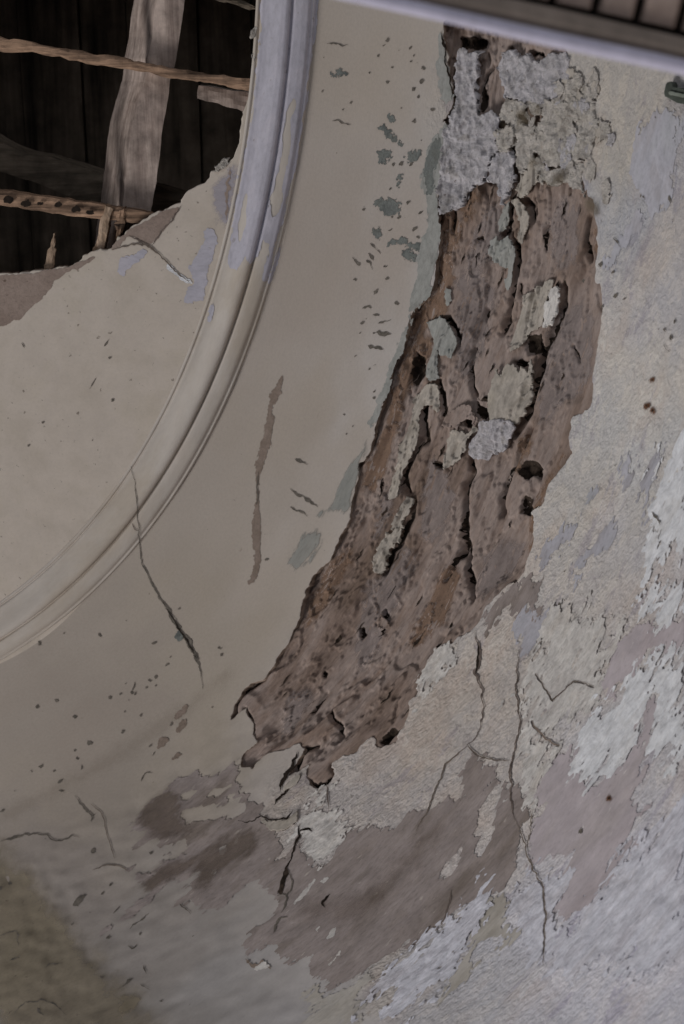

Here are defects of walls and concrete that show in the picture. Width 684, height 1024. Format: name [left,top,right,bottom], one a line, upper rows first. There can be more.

flaking render [0,257,95,326]
crack [131,466,203,689]
flaking render [99,23,657,1008]
crack [274,825,312,932]
crack [416,636,593,960]